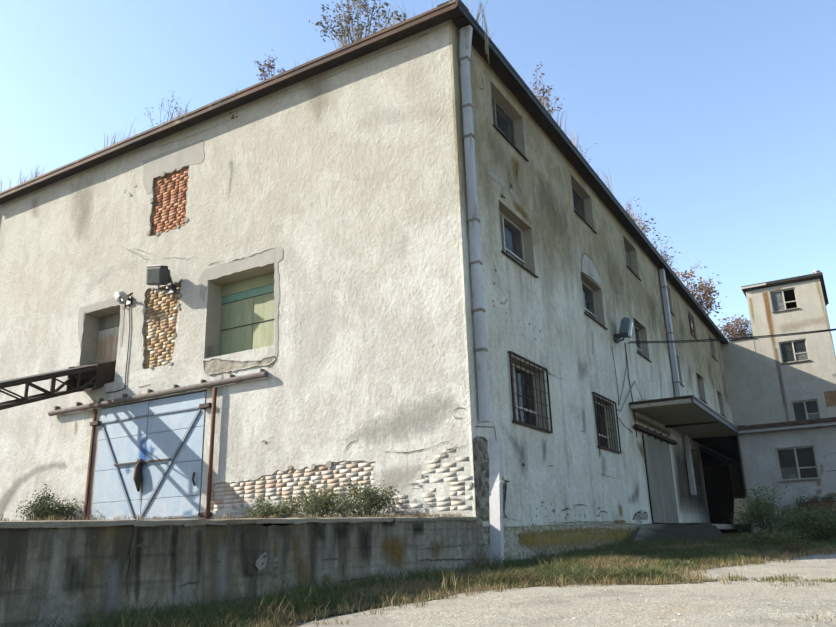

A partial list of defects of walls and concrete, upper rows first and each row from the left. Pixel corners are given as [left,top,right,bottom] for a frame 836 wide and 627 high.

flaking render [147,167,189,236]
flaking render [142,279,182,370]
corrosion [764,293,775,347]
flaking render [210,460,375,511]
crack [387,441,467,505]
peeling [391,436,490,521]
flaking render [502,479,523,520]